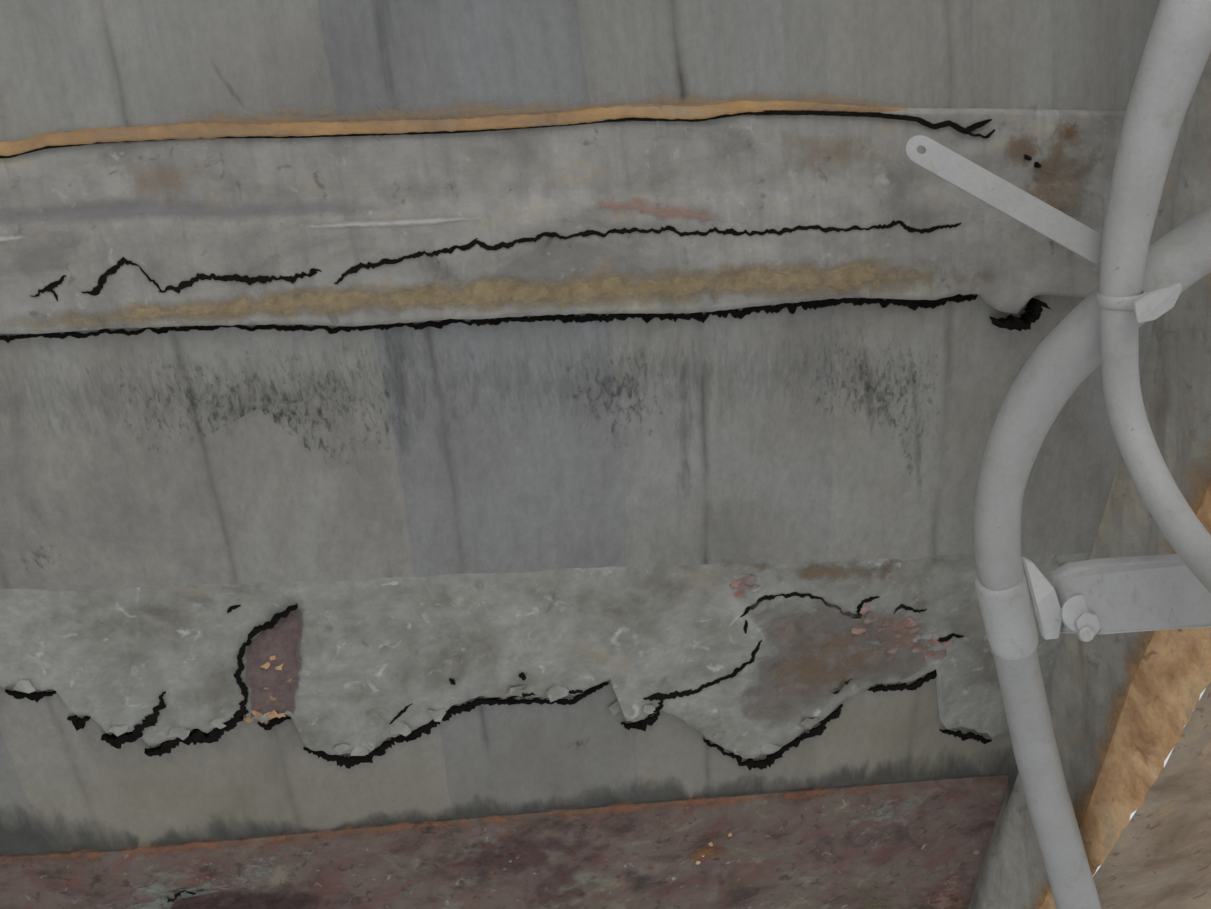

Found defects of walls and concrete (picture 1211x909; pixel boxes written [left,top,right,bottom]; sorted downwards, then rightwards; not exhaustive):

crack [0,110,995,158]
crack [30,220,961,301]
crack [0,294,1051,343]
spalling [244,610,303,725]
rust [549,796,757,815]